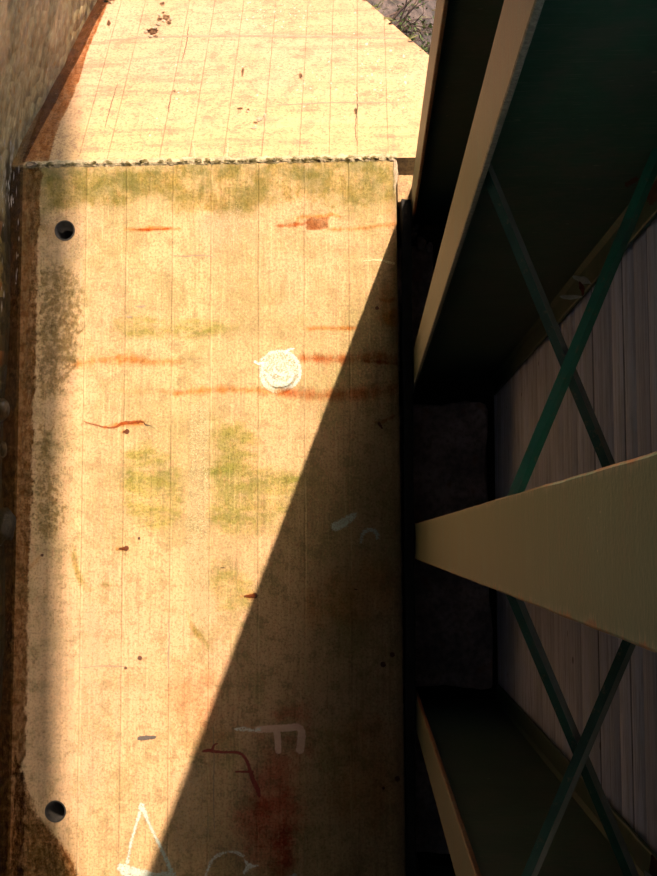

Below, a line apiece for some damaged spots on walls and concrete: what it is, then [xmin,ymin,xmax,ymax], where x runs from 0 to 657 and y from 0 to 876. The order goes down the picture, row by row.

damp [0,2,107,876]